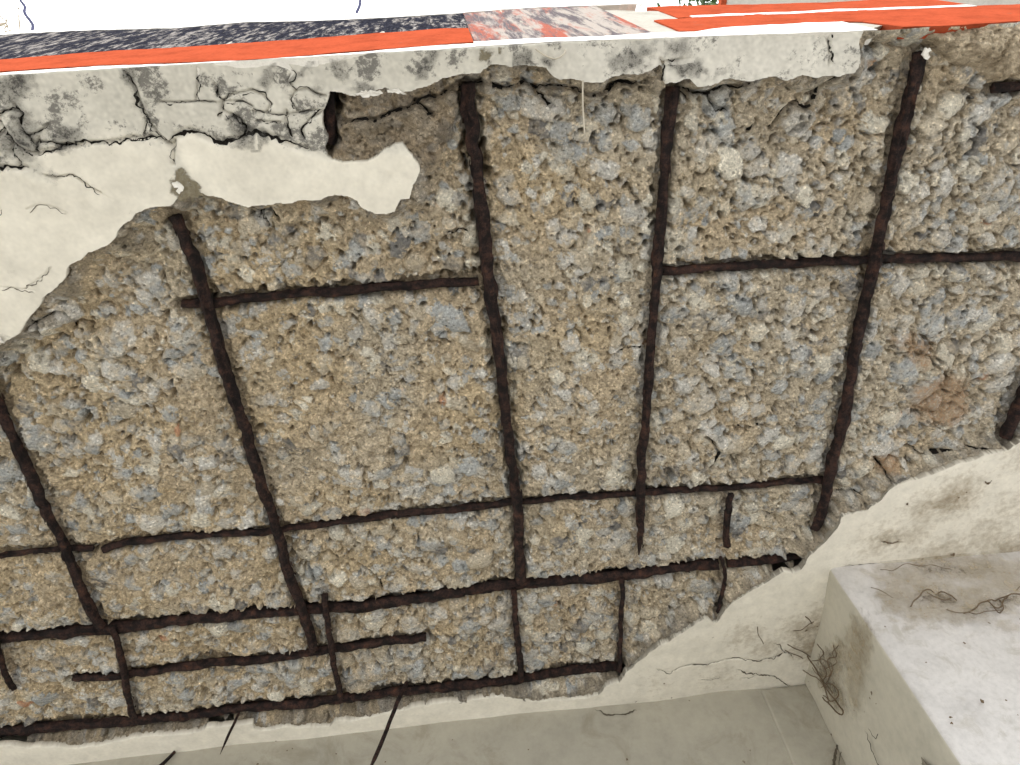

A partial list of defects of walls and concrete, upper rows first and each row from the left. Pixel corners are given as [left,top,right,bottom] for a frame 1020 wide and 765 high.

leakage [0,74,40,155]
crack [0,70,322,195]
crack [341,59,750,126]
spalling [810,50,1020,532]
spalling [0,27,935,643]
rust [911,377,969,426]
spalling [0,213,520,745]
crack [657,644,792,686]
crack [832,744,842,765]